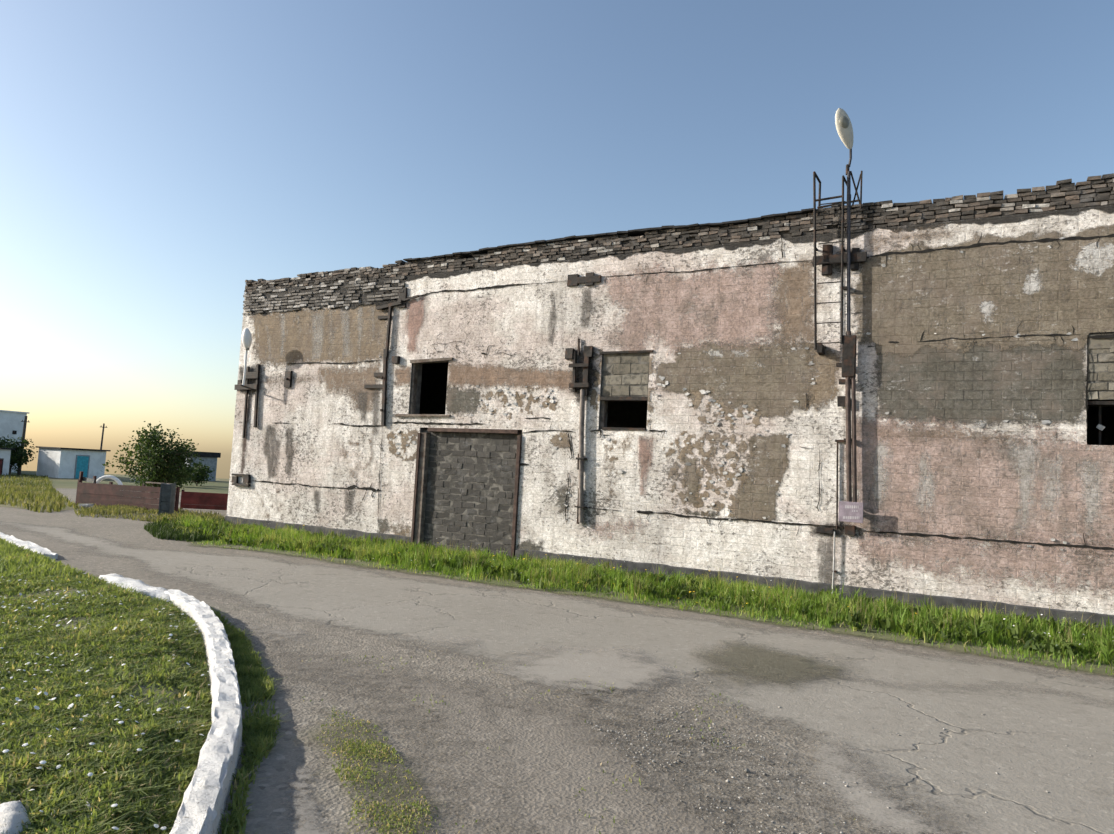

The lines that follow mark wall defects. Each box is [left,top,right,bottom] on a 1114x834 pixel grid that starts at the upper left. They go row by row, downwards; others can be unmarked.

crack [867,233,1114,264]
leakage [264,362,380,512]
crack [251,417,485,533]
crack [524,417,821,534]
flaking render [242,204,1114,429]
flaking render [647,340,815,523]
crack [868,322,1114,427]
crack [865,529,1114,551]